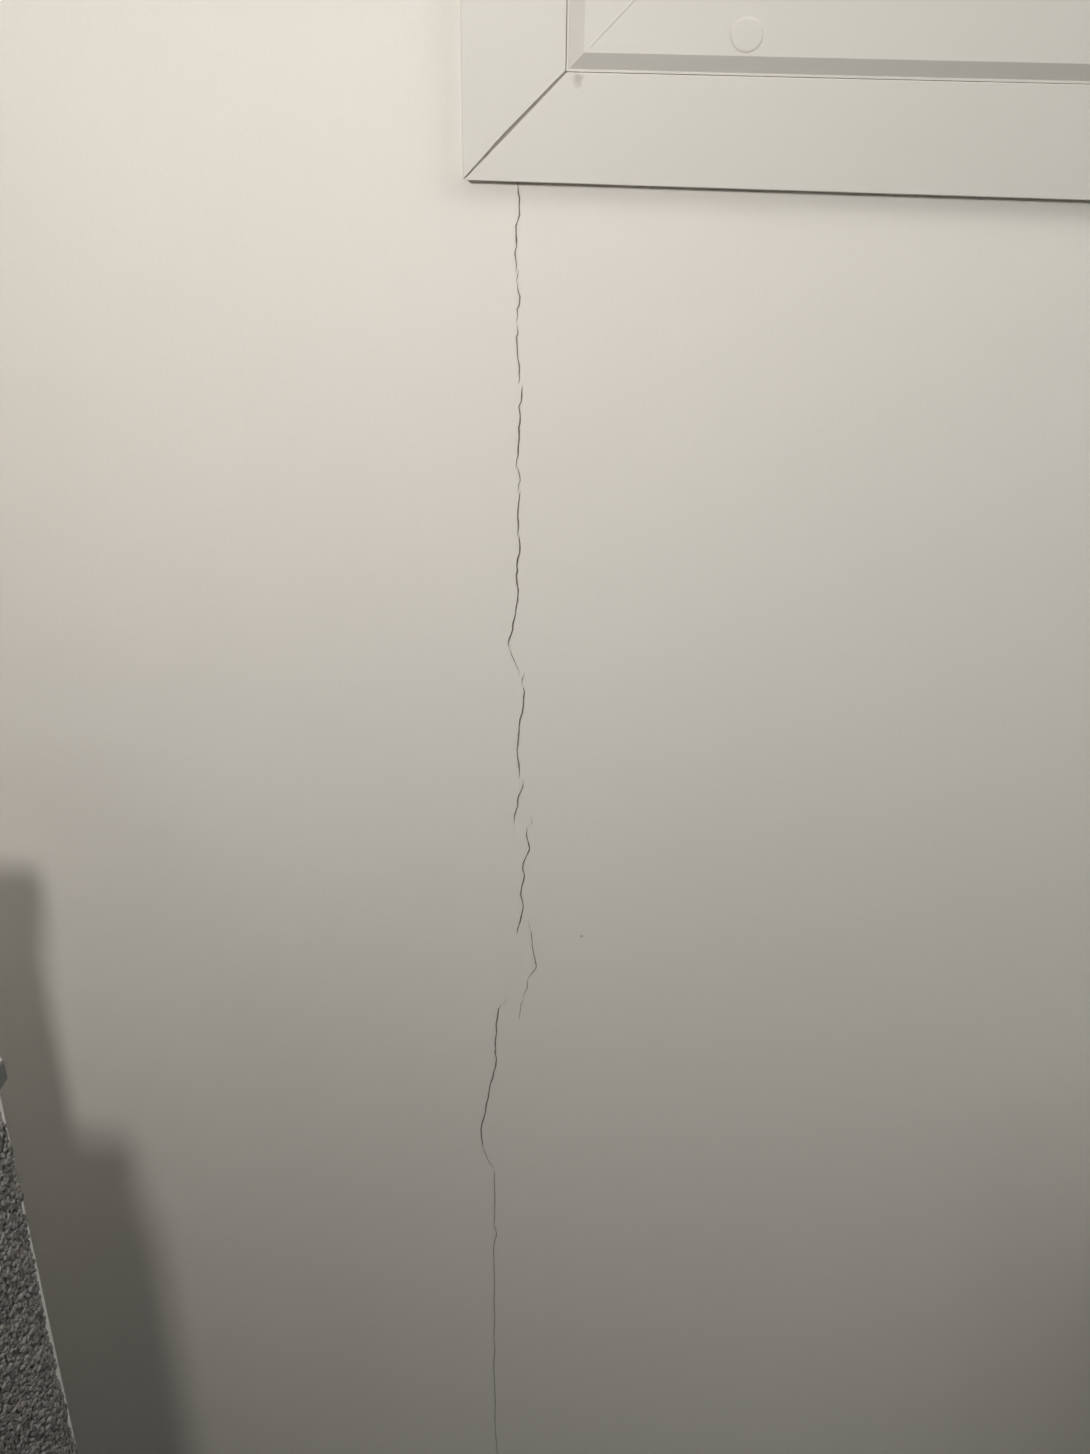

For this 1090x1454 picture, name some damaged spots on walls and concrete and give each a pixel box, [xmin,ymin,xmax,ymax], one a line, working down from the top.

crack [479,184,537,1387]